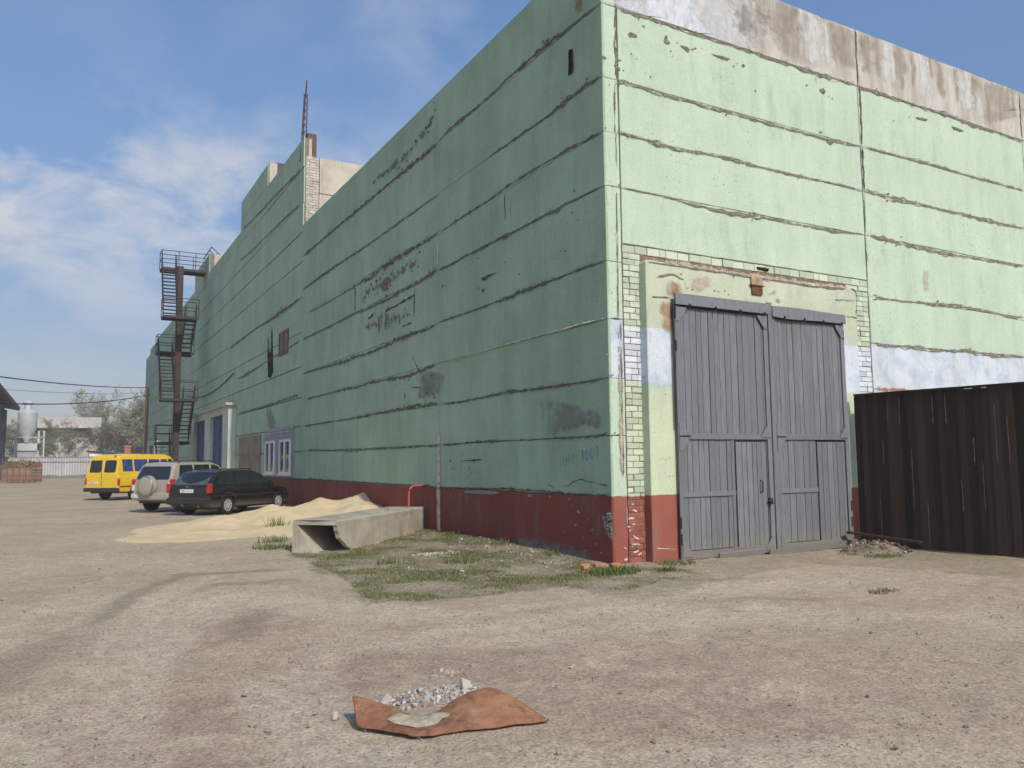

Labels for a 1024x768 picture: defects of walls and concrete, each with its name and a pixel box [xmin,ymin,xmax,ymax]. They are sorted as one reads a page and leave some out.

water stain [615,0,767,51]
peeling [661,24,745,67]
water stain [798,9,830,64]
water stain [884,43,895,82]
crack [855,31,865,190]
water stain [957,71,974,109]
peeling [360,251,420,303]
corrosion [661,284,679,330]